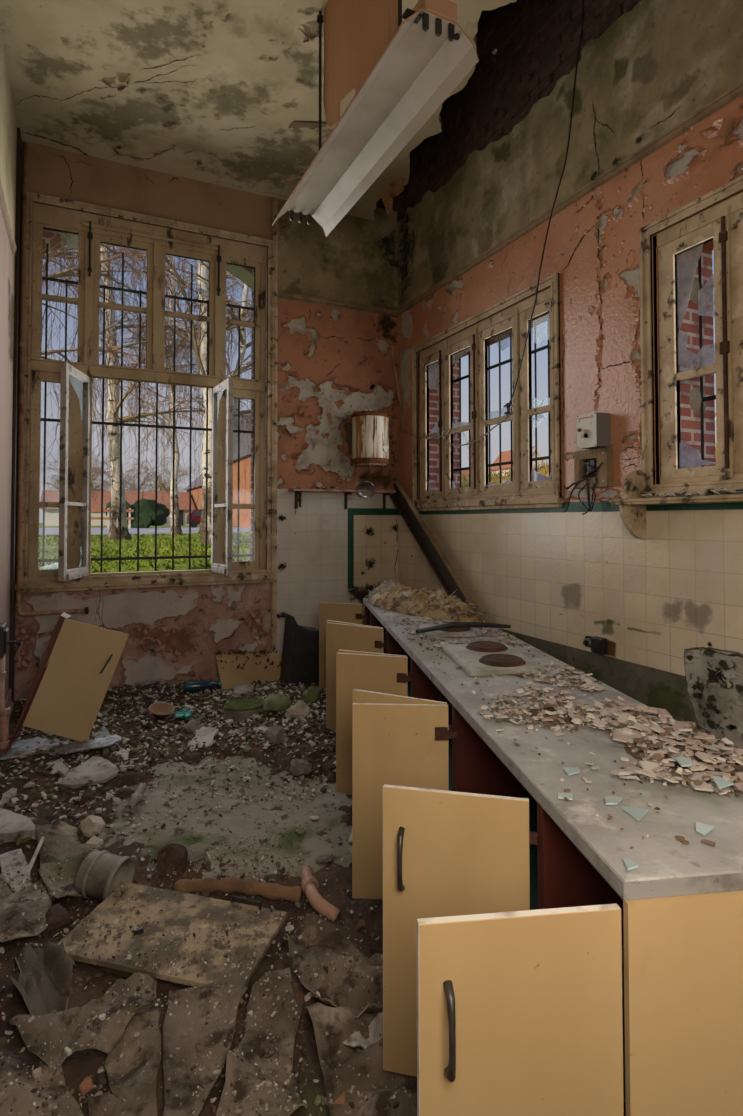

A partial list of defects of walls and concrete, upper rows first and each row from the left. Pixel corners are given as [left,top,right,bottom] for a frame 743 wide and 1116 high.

crack [14,55,197,106]
flaking render [398,0,642,222]
peeling [594,93,743,250]
crack [562,99,642,467]
peeling [600,262,640,304]
peeling [277,315,398,489]
peeling [14,584,260,668]
peeling [119,651,195,688]